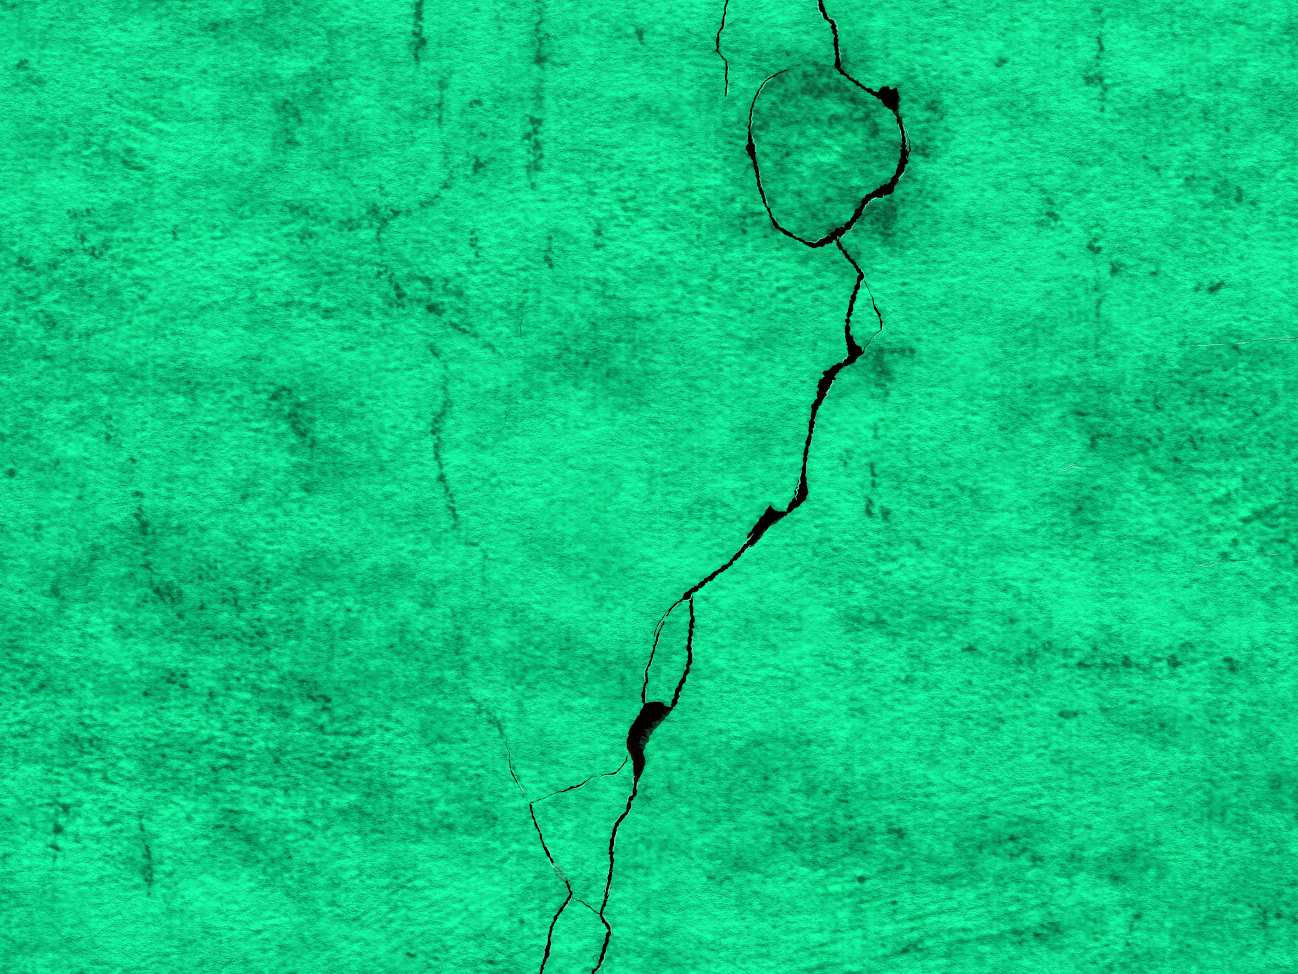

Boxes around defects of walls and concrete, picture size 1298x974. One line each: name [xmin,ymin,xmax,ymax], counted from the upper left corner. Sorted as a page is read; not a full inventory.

crack [716,0,911,516]
crack [641,533,754,707]
crack [506,737,639,974]